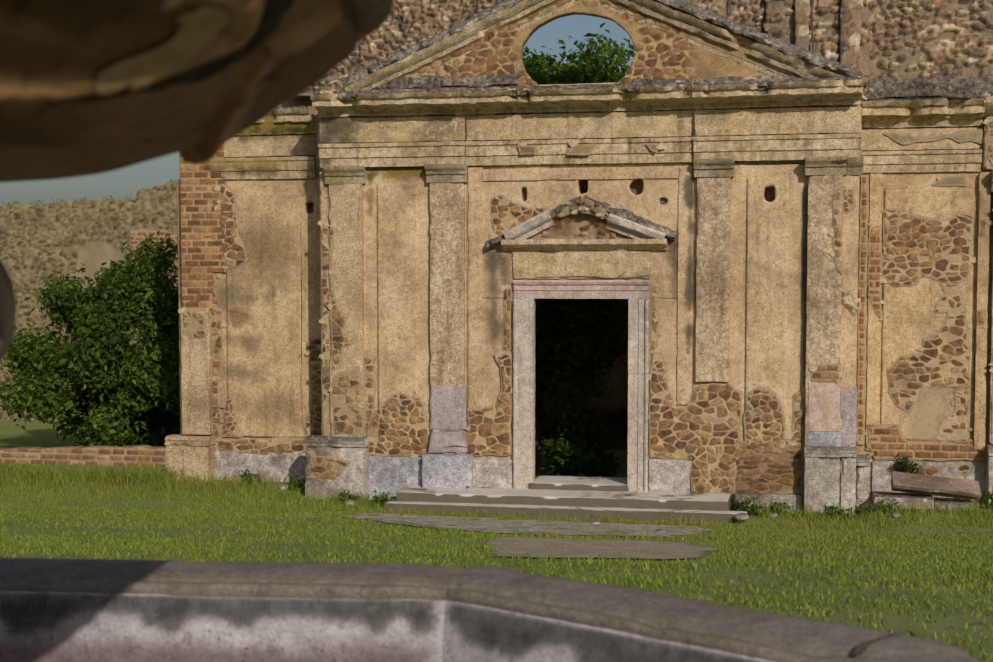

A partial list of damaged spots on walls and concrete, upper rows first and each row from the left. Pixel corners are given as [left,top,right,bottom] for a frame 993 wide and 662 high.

peeling [96,0,230,96]
spalling [983,115,993,165]
spalling [489,195,552,239]
water stain [685,176,694,208]
water stain [686,256,695,306]
spalling [178,184,430,483]
spalling [466,284,513,456]
spalling [648,282,805,494]
spalling [809,363,845,383]
spalling [829,175,993,494]